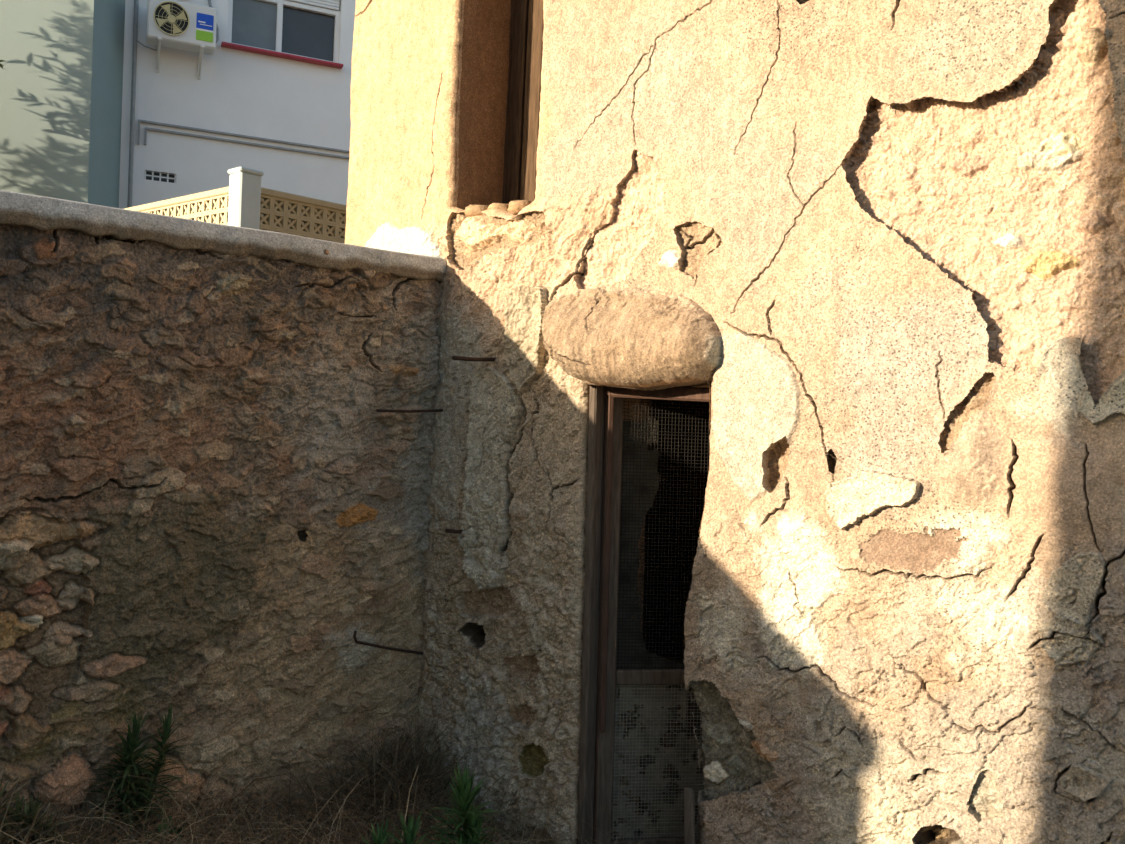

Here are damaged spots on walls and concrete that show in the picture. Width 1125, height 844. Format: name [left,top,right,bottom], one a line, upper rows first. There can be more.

crack [573,0,712,150]
flaking render [445,211,549,271]
flaking render [573,149,669,289]
flaking render [658,221,724,279]
crack [722,121,855,488]
flaking render [841,0,1125,453]
flaking render [455,286,548,620]
flaking render [824,470,921,530]
crack [835,533,1045,602]
crack [1006,439,1020,519]
crack [1025,442,1125,652]
crack [892,660,1033,736]